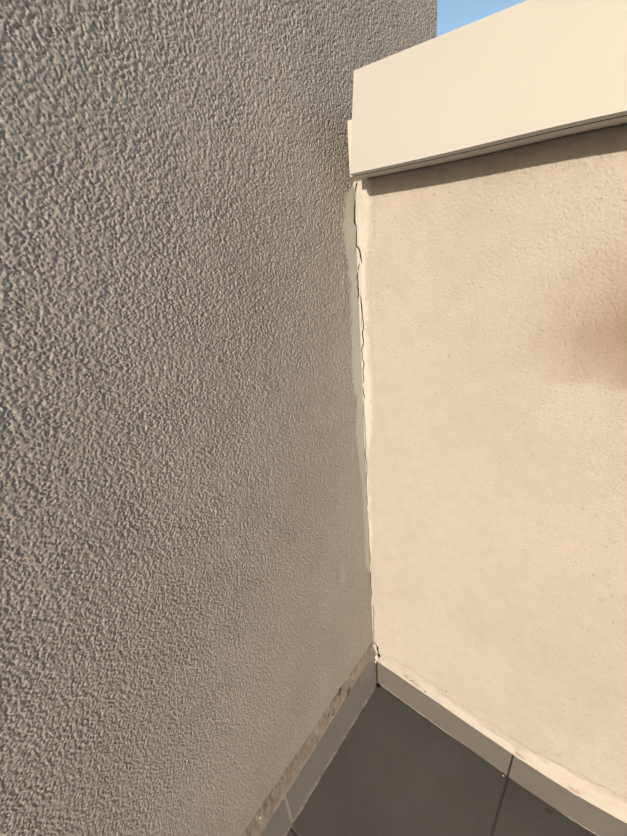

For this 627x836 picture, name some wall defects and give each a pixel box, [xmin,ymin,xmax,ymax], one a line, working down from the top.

crack [354,183,374,638]